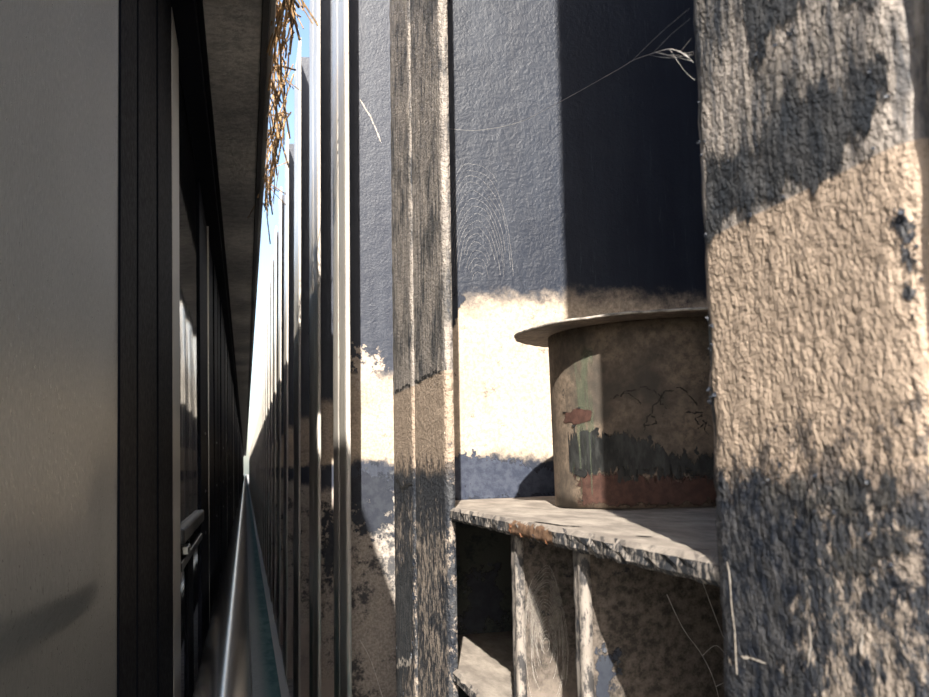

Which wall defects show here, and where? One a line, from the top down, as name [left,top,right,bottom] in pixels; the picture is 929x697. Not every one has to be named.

peeling [350,341,391,399]
crack [613,386,707,433]
damp [455,449,555,500]
peeling [351,459,395,549]
peeling [395,538,417,697]